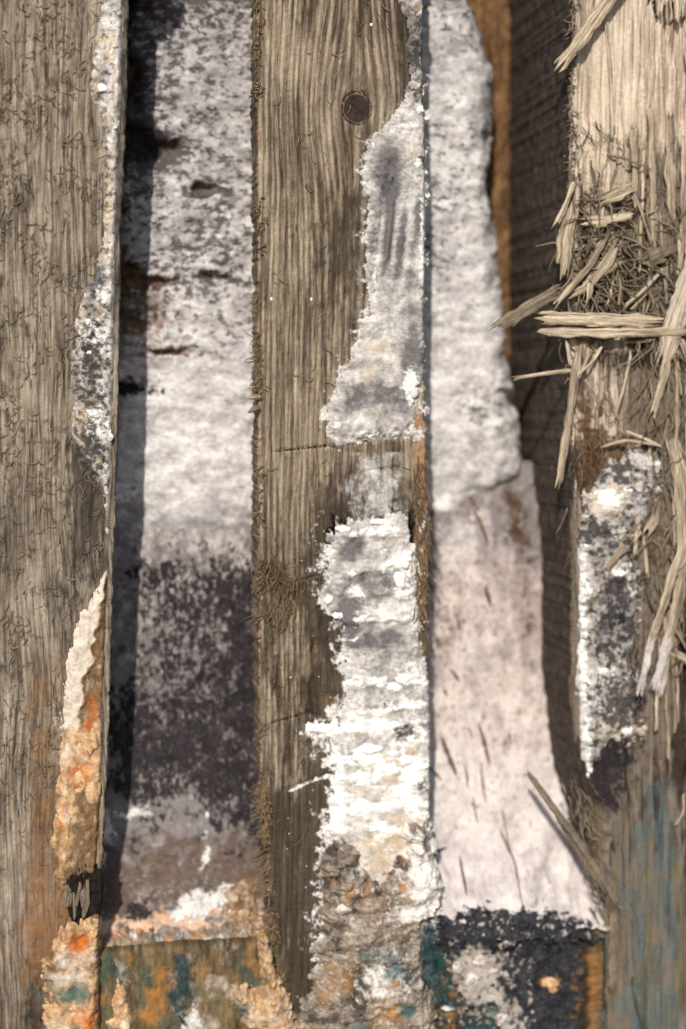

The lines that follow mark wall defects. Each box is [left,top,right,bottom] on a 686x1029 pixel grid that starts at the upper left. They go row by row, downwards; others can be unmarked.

rust [50,572,107,891]
leakage [102,538,262,872]
rust [38,916,104,1029]
peeling [106,979,132,1029]